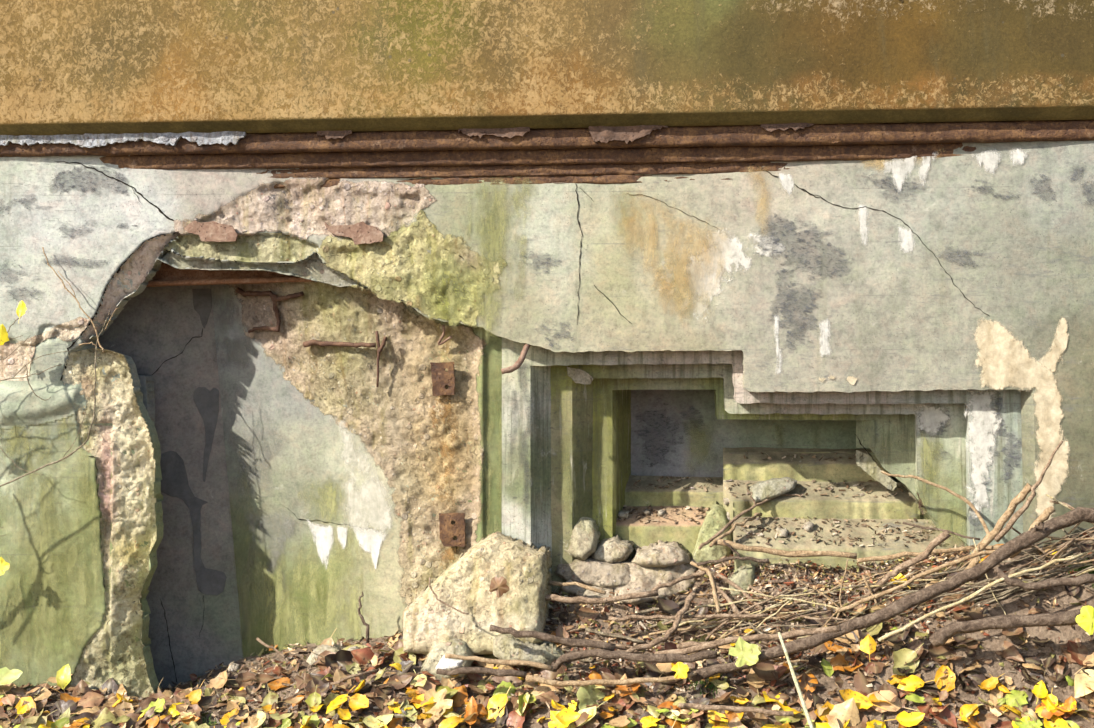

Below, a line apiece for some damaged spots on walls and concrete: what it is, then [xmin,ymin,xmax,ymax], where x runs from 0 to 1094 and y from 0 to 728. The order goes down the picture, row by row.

spalling [0,131,246,148]
crack [55,161,195,381]
corrosion [458,127,530,139]
crack [575,183,632,325]
corrosion [589,125,668,144]
leakage [659,215,852,373]
crack [752,164,989,316]
leakage [863,153,936,203]
leakage [975,149,1055,205]
spalling [0,177,507,697]
leakage [309,420,391,569]
peeling [975,318,1070,522]